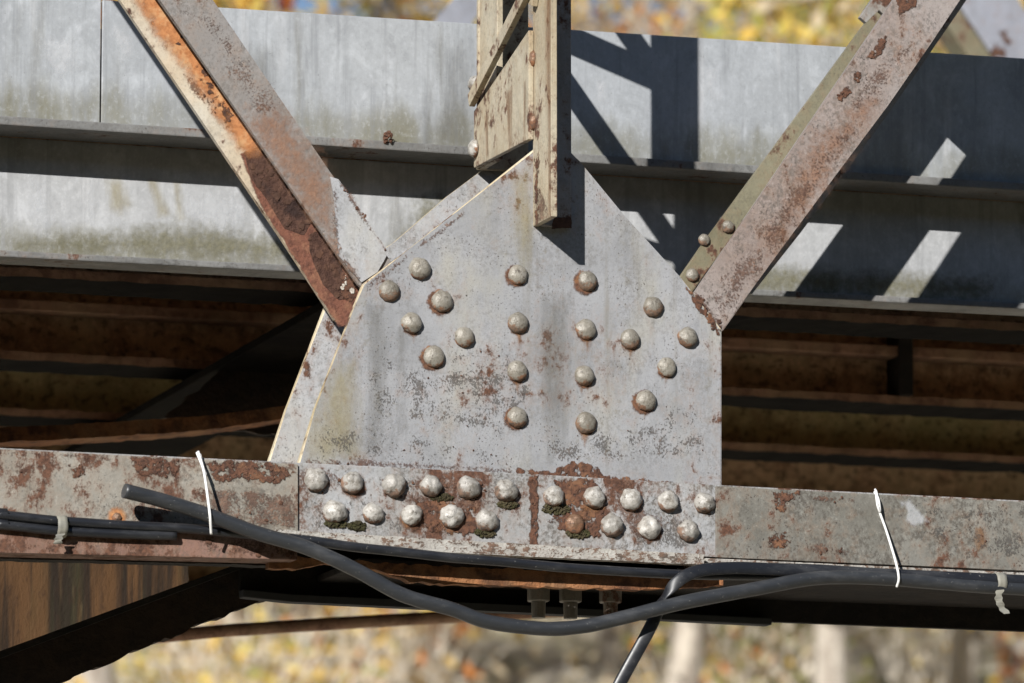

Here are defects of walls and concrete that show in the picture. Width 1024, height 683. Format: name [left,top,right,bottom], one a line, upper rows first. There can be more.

corrosion [896,0,917,16]
corrosion [137,0,462,327]
corrosion [686,35,912,343]
corrosion [419,346,438,371]
corrosion [631,390,652,415]
corrosion [64,454,88,478]
corrosion [131,455,190,478]
corrosion [195,459,671,545]
corrosion [773,490,852,512]
corrosion [768,532,791,549]